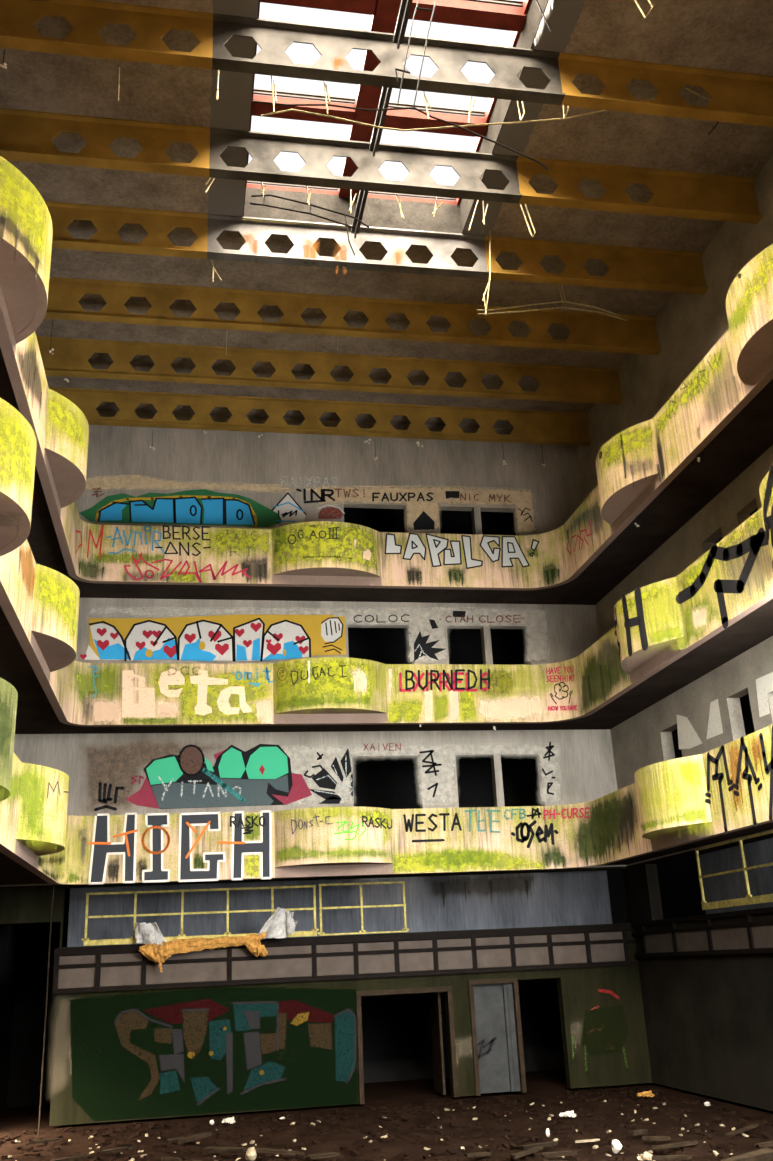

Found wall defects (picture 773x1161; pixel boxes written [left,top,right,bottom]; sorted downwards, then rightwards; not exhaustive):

damp [545,792,637,867]